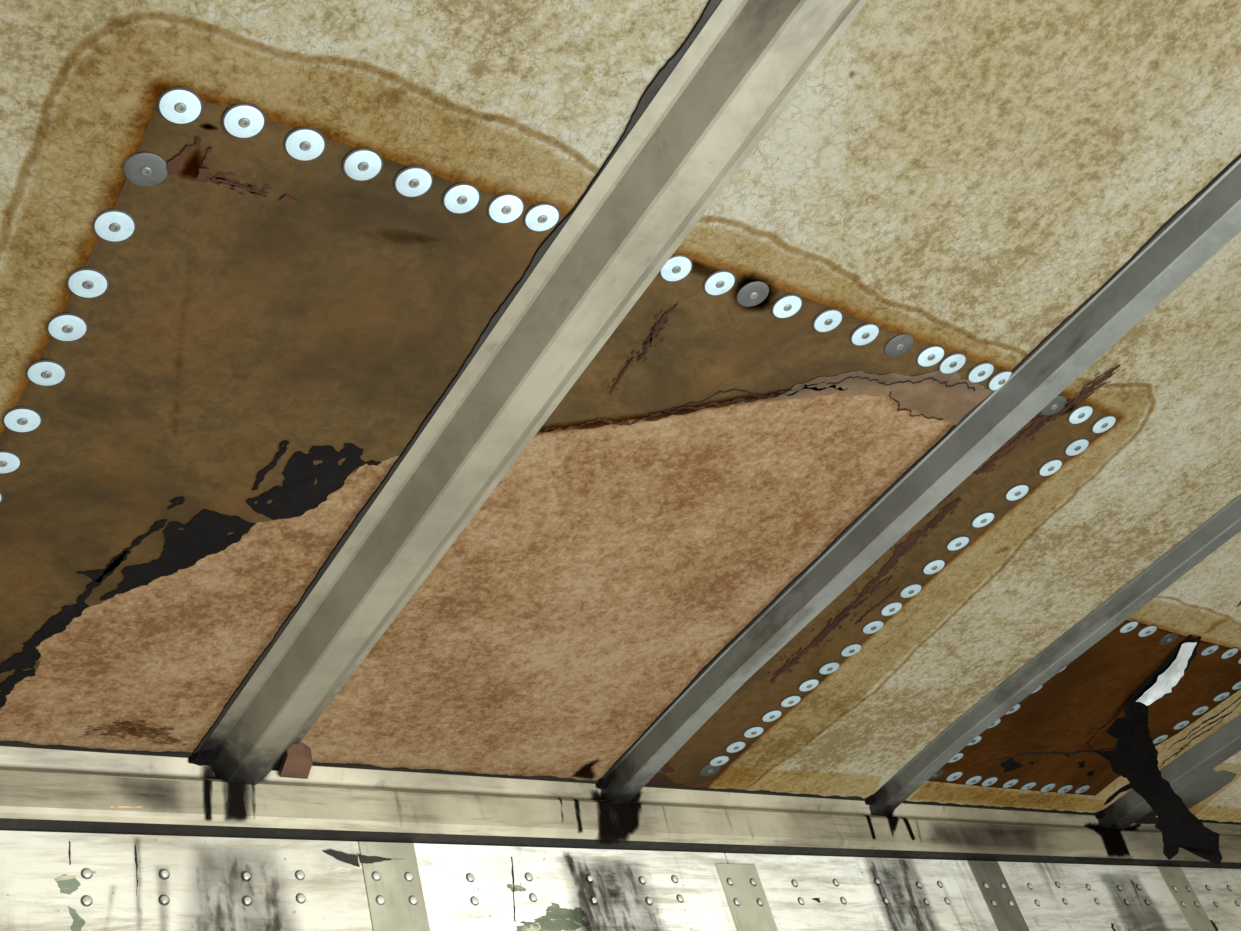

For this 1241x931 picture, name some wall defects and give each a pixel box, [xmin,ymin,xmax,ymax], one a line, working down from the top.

corrosion [182,151,203,178]
crack [209,172,274,198]
crack [536,302,975,435]
crack [768,364,1126,683]
peeling [0,440,382,707]
crack [1159,697,1241,769]
peeling [649,764,684,788]
damp [559,791,641,845]
peeling [54,875,86,931]
peeling [517,903,583,931]
damp [566,855,661,931]